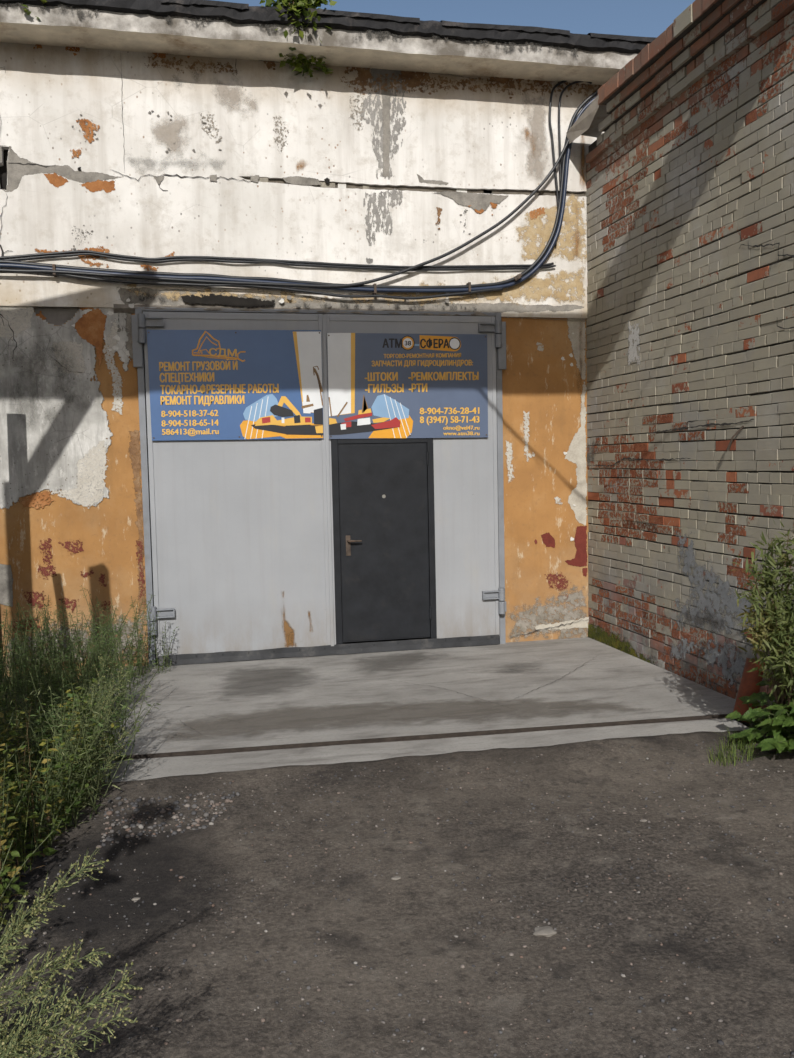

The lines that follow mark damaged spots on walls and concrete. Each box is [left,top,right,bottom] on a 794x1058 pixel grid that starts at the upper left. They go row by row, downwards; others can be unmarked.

peeling [746,0,794,125]
spalling [0,114,123,193]
crack [113,106,259,191]
water stain [361,68,412,264]
peeling [601,105,655,252]
peeling [35,225,113,268]
peeling [0,287,704,546]
spalling [128,430,147,614]
peeling [718,483,747,545]
spalling [0,564,13,607]
rust [283,613,294,647]
peeling [592,578,735,699]